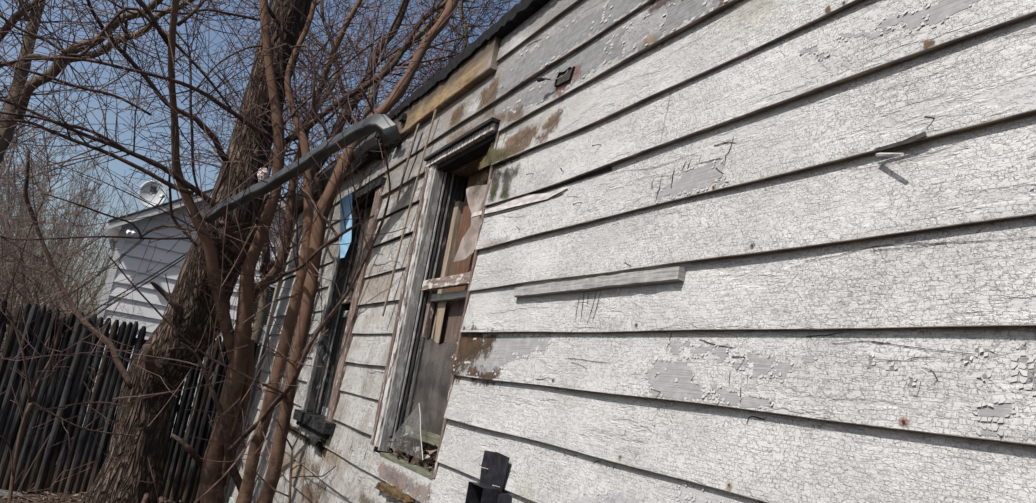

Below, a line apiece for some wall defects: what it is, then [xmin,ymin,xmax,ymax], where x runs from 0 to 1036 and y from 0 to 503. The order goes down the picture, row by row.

peeling [836,0,979,41]
peeling [494,0,728,117]
leakage [447,104,473,143]
leakage [474,78,563,202]
crack [806,236,1036,261]
peeling [452,333,553,376]
peeling [645,338,818,409]
crack [699,339,767,426]
crack [806,332,1005,396]
peeling [1009,341,1036,395]
peeling [971,398,1016,436]
leakage [378,464,430,502]